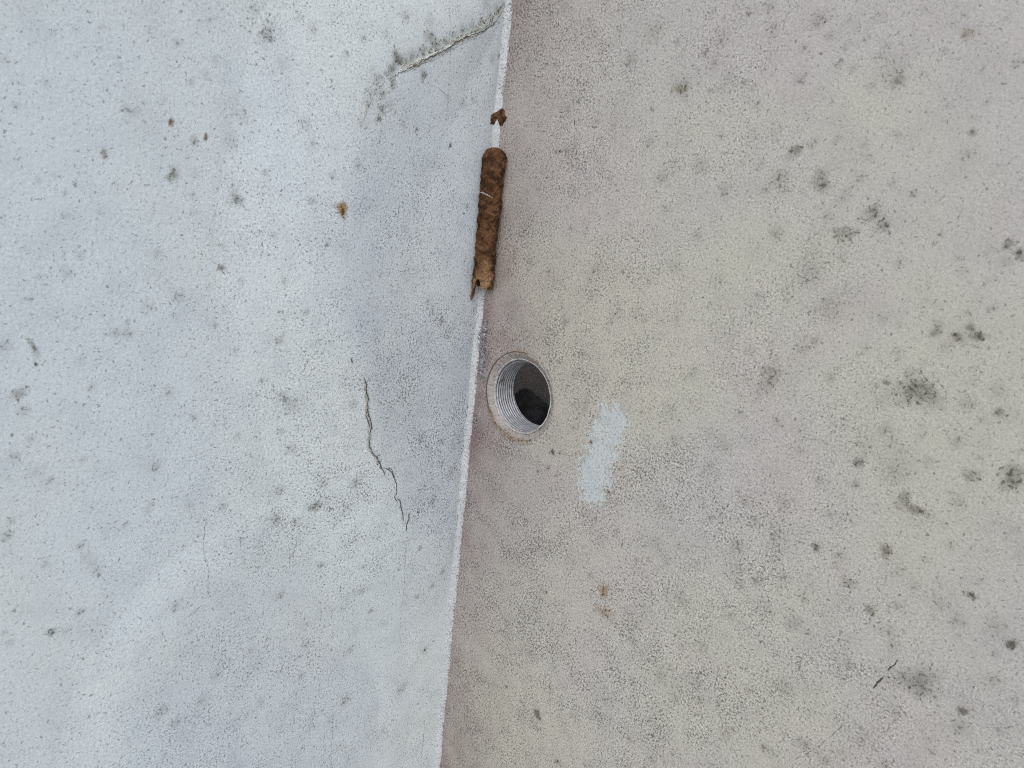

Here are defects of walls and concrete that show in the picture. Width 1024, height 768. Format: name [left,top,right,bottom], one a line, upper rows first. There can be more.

crack [364,6,502,122]
crack [351,358,410,530]